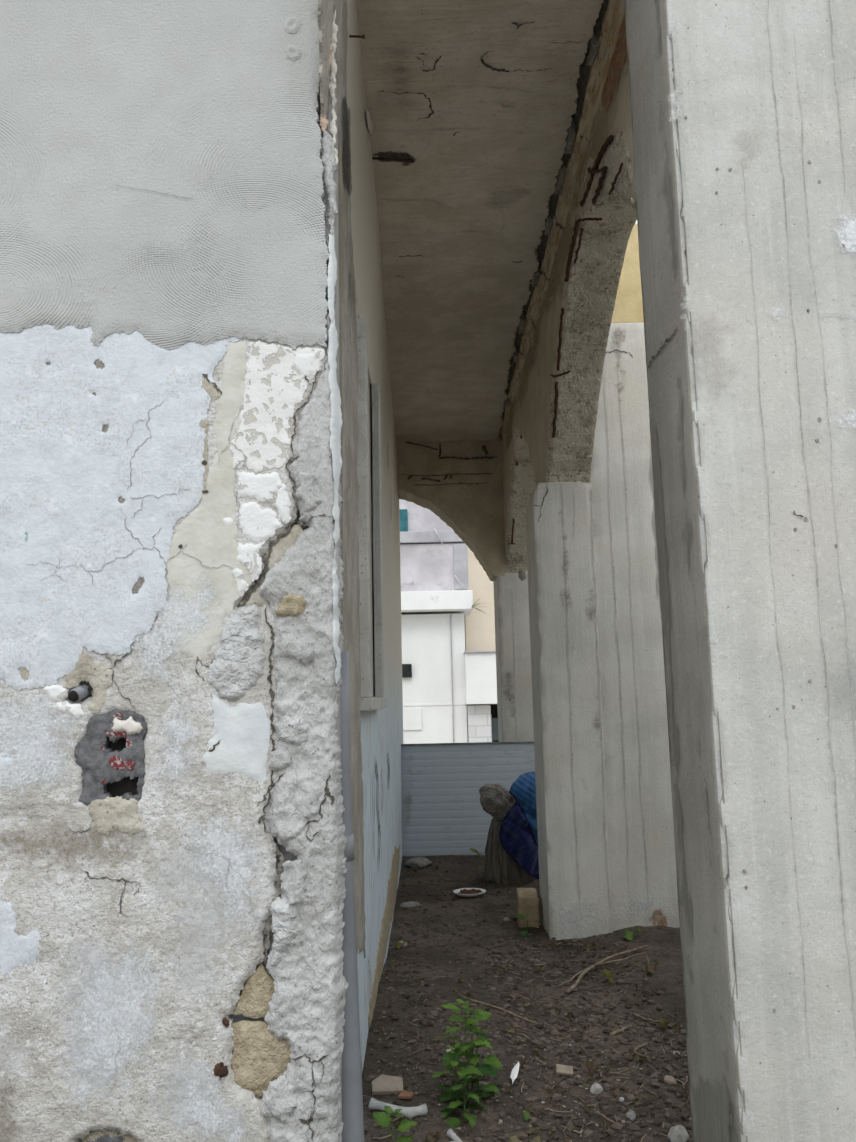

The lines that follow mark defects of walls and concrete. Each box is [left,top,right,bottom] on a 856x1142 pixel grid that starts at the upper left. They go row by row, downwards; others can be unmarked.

spalling [499,0,633,441]
rust [506,13,628,448]
leakage [835,216,856,252]
peeling [164,340,325,660]
crack [387,442,498,486]
spalling [44,652,115,719]
crack [27,360,330,965]
crack [306,774,335,842]
peeling [280,858,307,909]
rust [213,1062,229,1080]
spalling [231,963,297,1125]
crack [292,1052,331,1141]